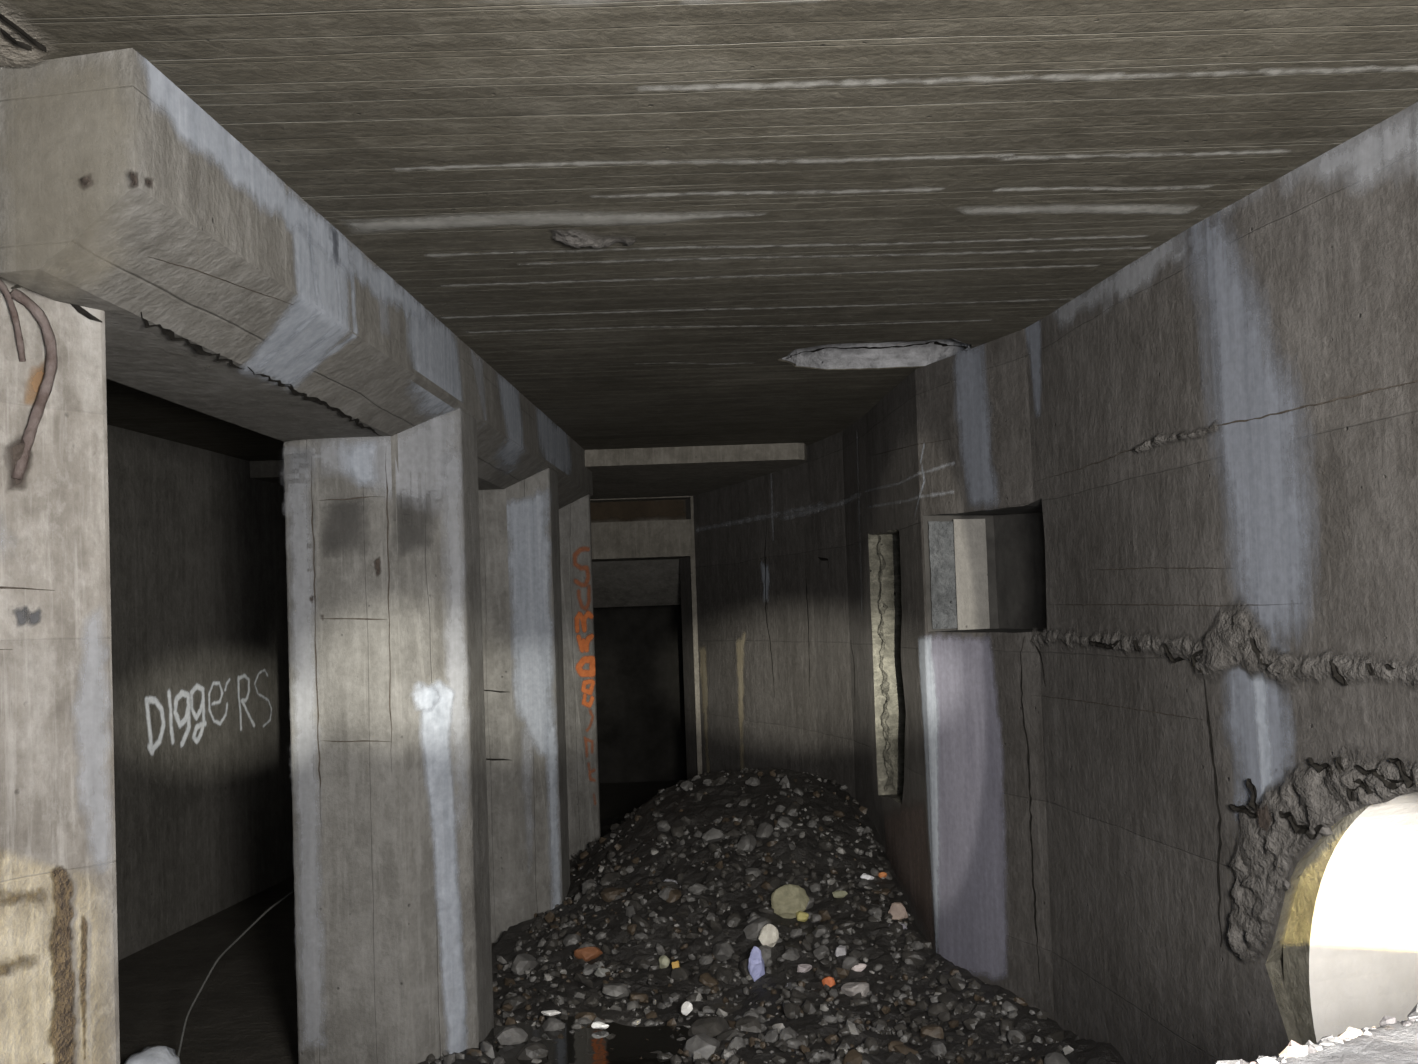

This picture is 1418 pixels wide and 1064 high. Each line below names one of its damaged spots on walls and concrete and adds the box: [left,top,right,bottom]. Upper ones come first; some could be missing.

spalling [0,6,47,68]
corrosion [27,366,45,402]
spalling [781,339,970,369]
spalling [1031,603,1418,688]
spalling [1226,748,1418,961]